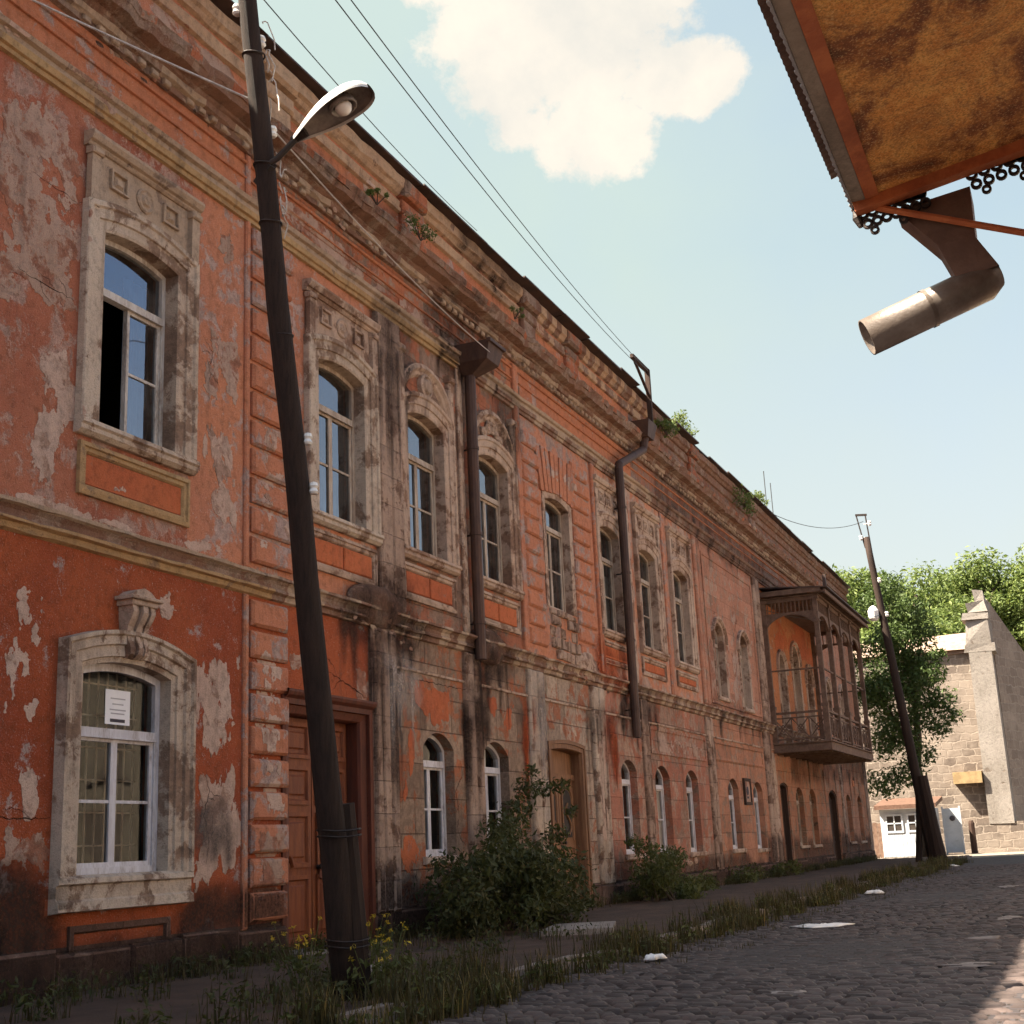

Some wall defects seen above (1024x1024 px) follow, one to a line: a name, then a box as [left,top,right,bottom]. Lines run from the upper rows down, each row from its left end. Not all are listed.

rust [791,0,1024,216]
peeling [0,98,93,318]
peeling [203,327,242,406]
peeling [15,350,132,532]
peeling [198,424,237,530]
peeling [184,540,222,552]
peeling [3,586,43,722]
peeling [195,655,240,758]
peeling [414,679,450,726]
peeling [0,767,50,876]
peeling [193,763,287,899]
peeling [401,835,419,873]